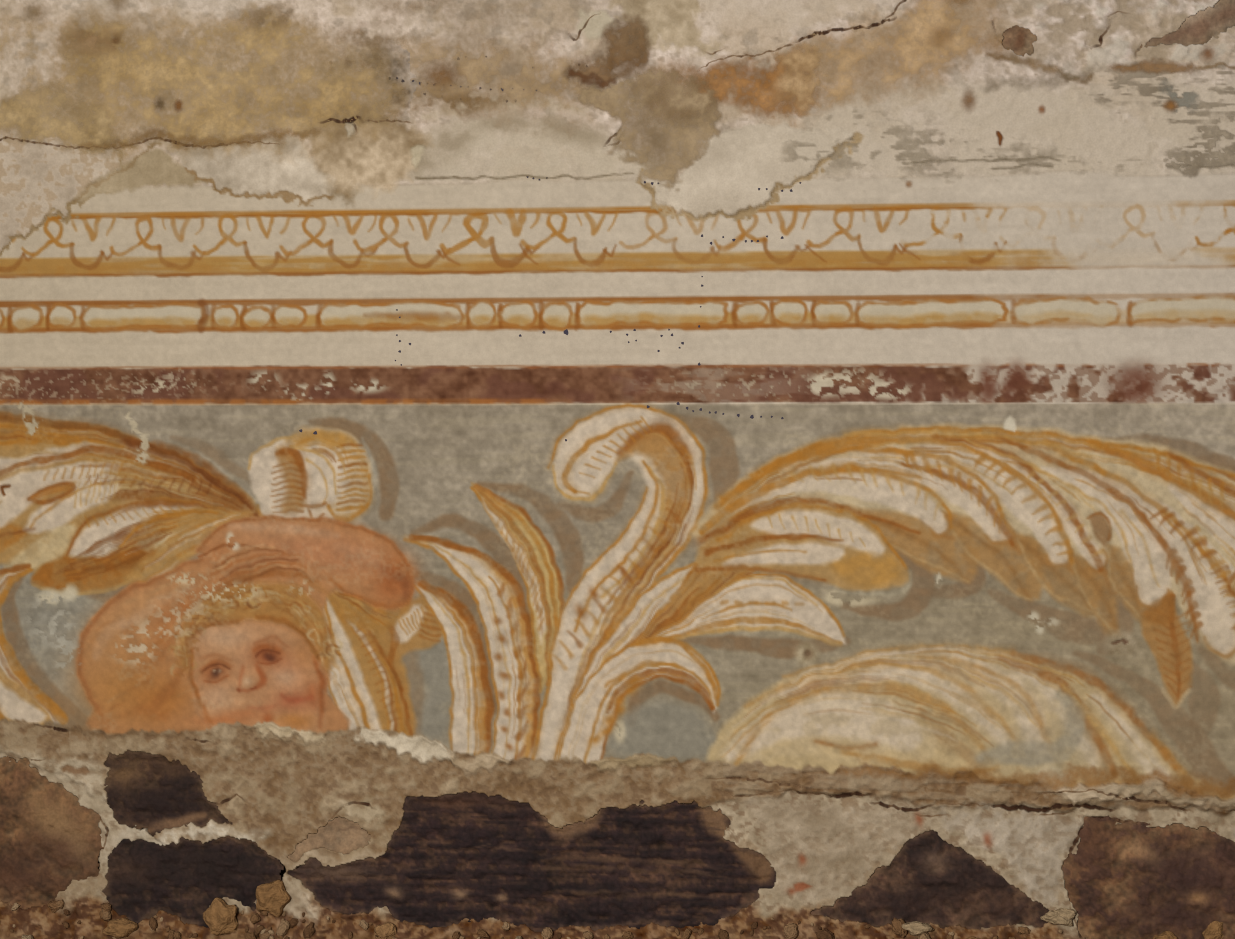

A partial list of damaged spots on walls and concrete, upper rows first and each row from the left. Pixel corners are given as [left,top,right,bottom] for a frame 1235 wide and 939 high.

crack [572,15,594,41]
crack [705,0,906,67]
crack [0,137,277,149]
water stain [0,12,721,187]
crack [323,116,408,129]
peeling [1100,70,1235,176]
spalling [0,102,460,257]
peeling [0,372,196,436]
peeling [249,372,336,401]
peeling [740,369,912,401]
spalling [0,720,1235,878]
crack [713,777,1186,857]